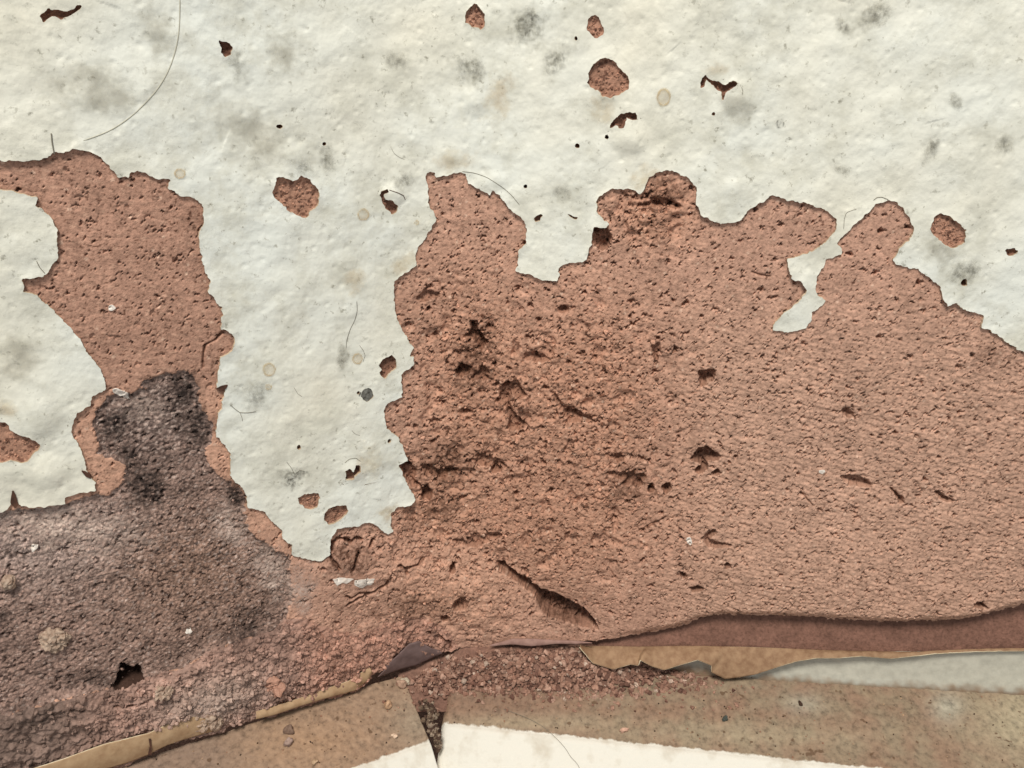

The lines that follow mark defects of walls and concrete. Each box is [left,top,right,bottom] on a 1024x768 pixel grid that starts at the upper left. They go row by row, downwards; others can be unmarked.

peeling [462,0,488,34]
peeling [584,11,607,41]
peeling [584,53,641,132]
damp [103,413,126,435]
damp [172,377,210,439]
flaking render [300,167,1024,651]
spalling [0,144,458,768]
damp [1,506,138,555]
damp [129,473,165,503]
damp [214,483,246,543]
damp [253,548,312,612]